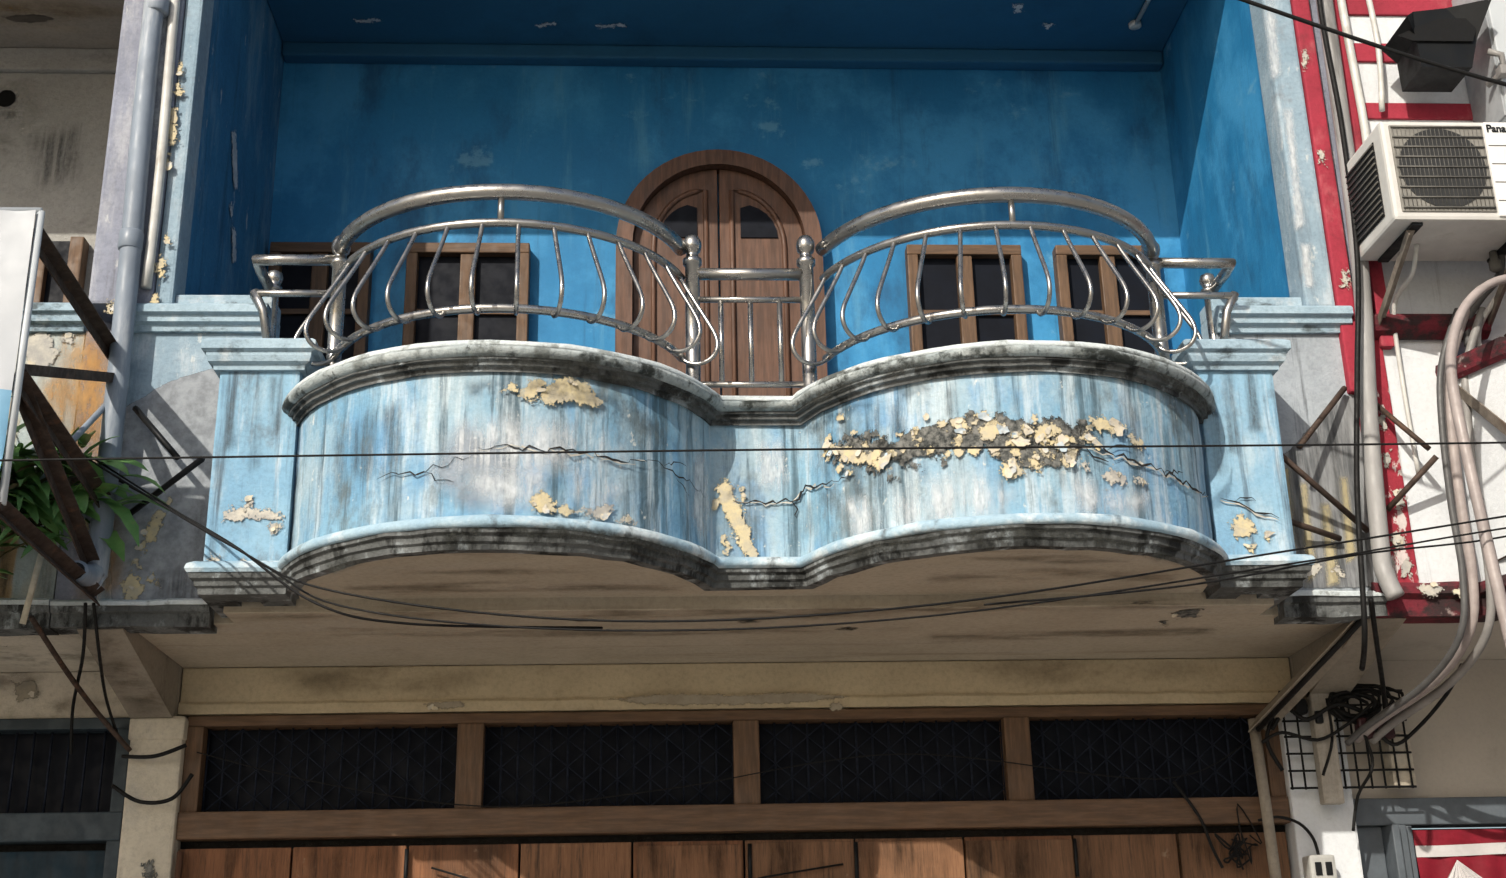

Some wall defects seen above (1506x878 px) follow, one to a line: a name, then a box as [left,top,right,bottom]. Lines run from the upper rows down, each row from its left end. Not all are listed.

peeling [166,60,185,171]
peeling [499,376,605,408]
peeling [111,369,285,600]
spalling [529,489,638,526]
crack [378,444,845,515]
peeling [712,477,759,557]
spalling [821,410,1149,490]
crack [1069,444,1279,520]
peeling [1228,511,1275,555]
peeling [1284,395,1378,588]
peeling [1390,488,1460,599]